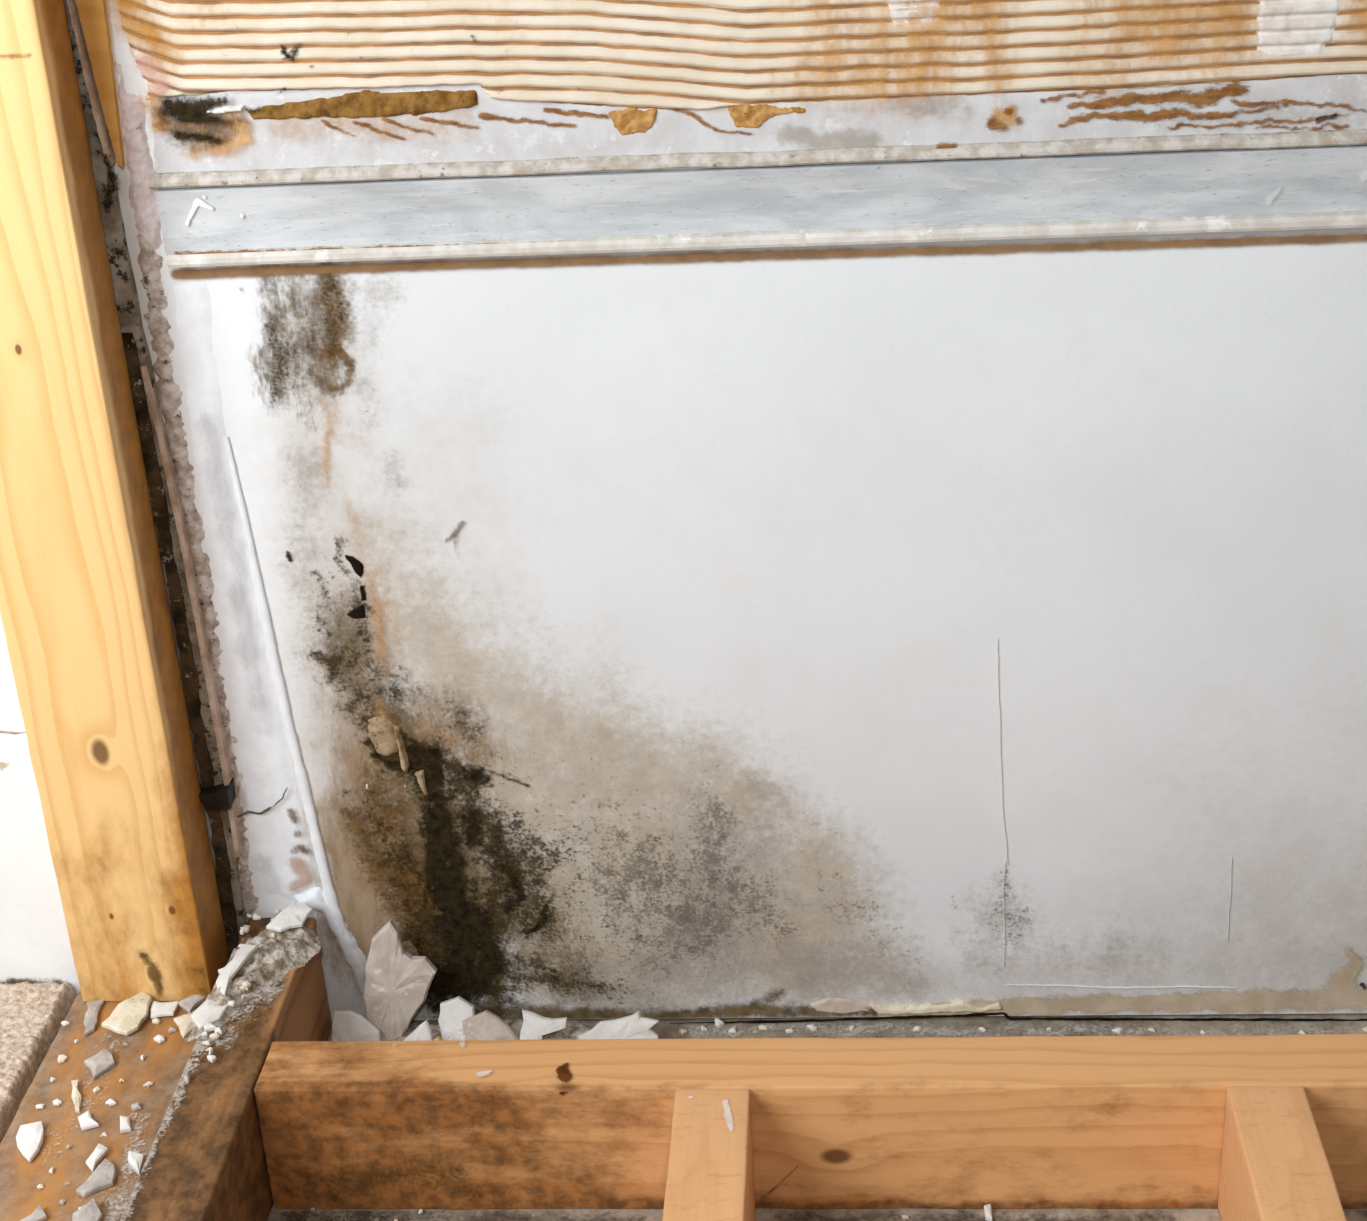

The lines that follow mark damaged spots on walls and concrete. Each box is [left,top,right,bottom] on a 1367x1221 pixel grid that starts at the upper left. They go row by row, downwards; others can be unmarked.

water stain [252,264,354,404]
water stain [307,531,878,1019]
peeling [809,947,1367,1016]